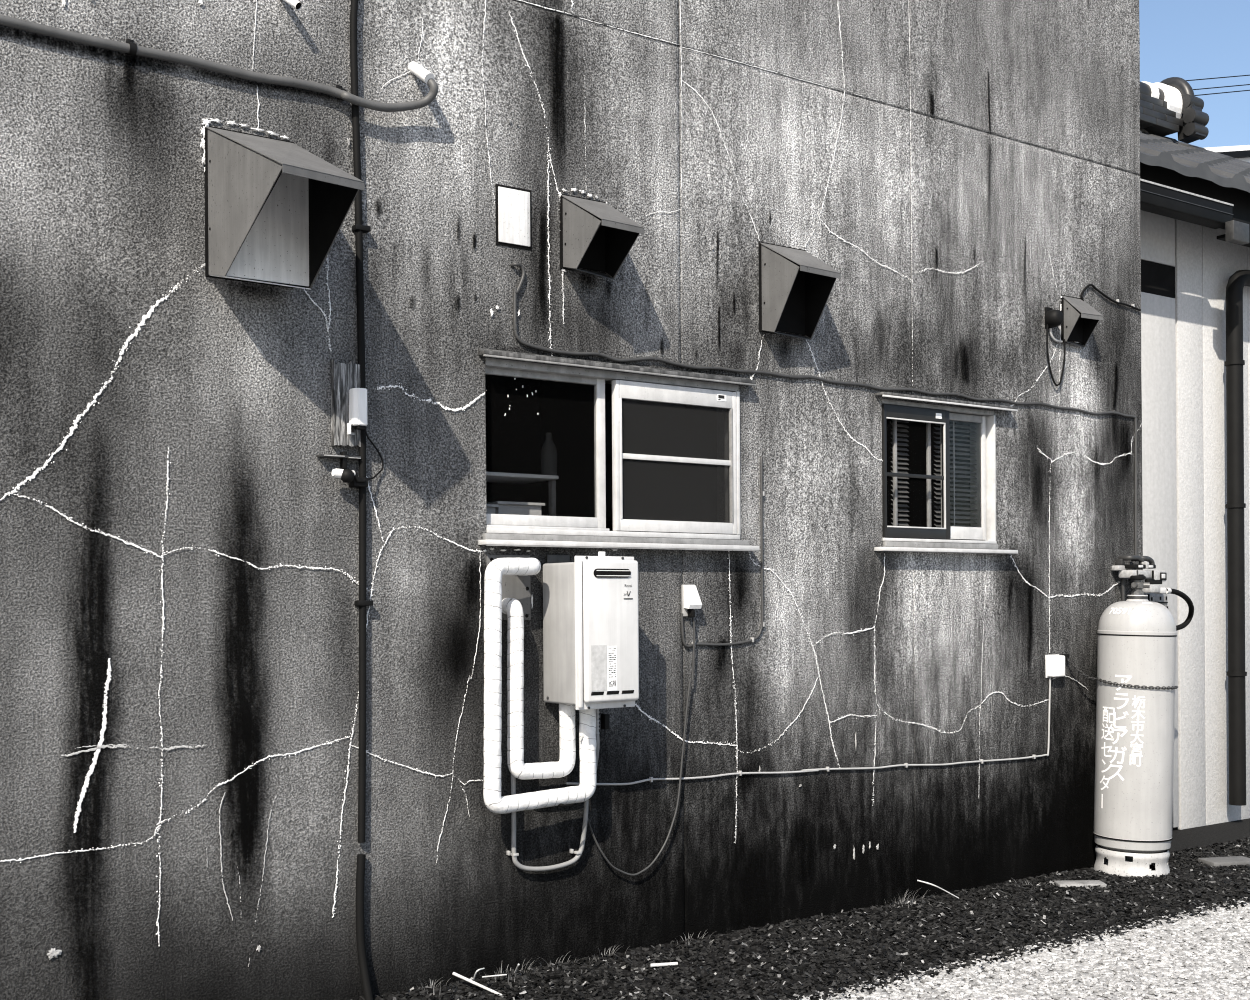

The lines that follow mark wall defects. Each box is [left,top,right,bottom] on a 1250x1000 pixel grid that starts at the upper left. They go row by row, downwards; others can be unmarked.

damp [552,16,565,150]
crack [382,0,984,385]
damp [64,474,117,1000]
damp [218,487,266,889]
crack [0,255,487,947]
crack [635,338,1142,843]